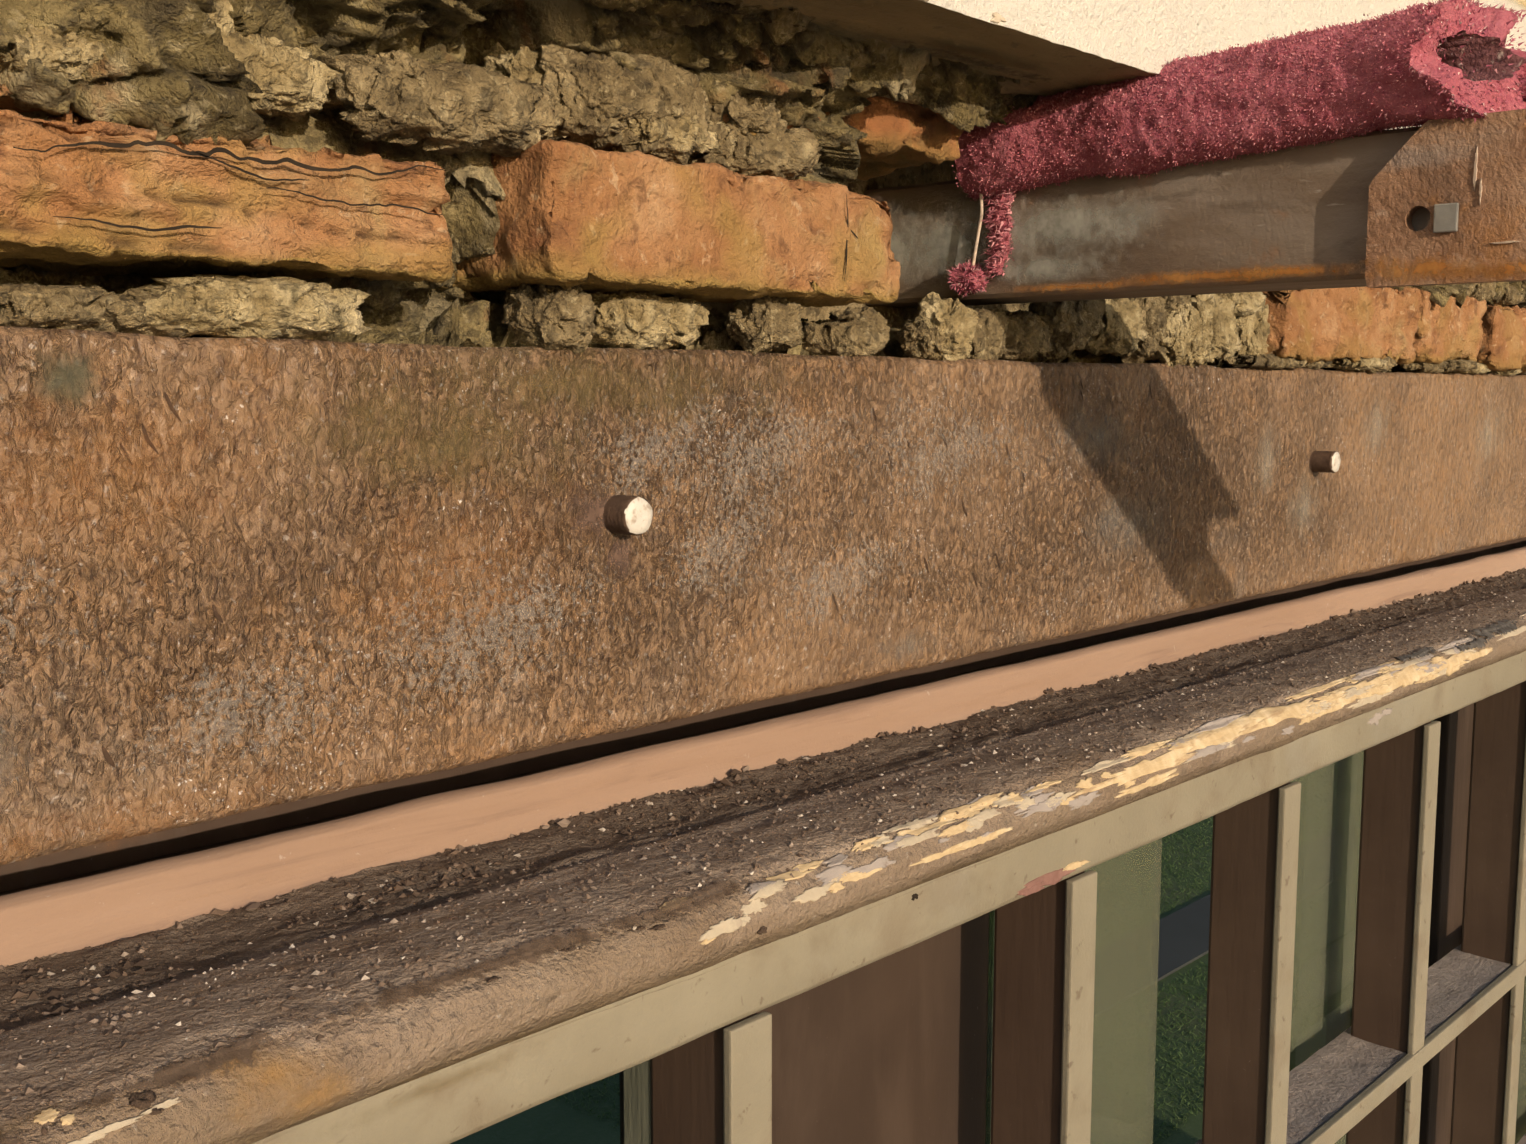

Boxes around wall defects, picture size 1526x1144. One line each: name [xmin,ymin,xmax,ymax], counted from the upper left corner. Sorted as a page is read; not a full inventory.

crack [13,140,446,215]
crack [53,216,222,232]
rust [1021,266,1338,291]
peeling [315,613,1526,1025]
peeling [33,1032,273,1144]